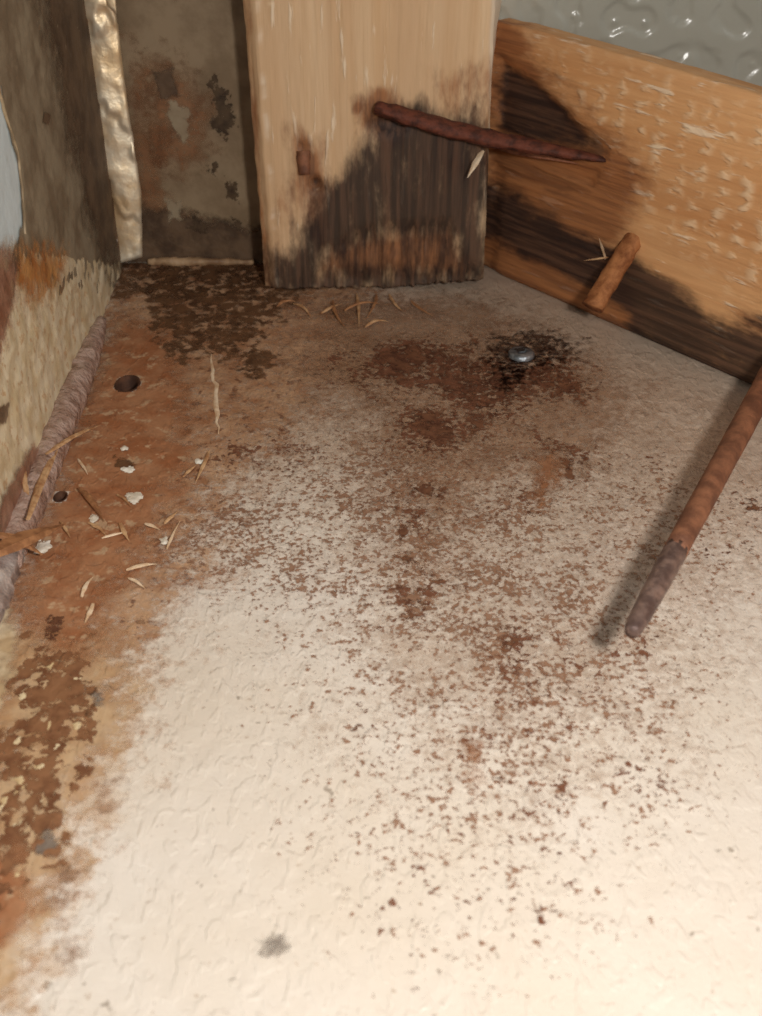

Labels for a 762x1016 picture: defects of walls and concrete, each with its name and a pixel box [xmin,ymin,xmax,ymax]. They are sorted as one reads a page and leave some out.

rust [0,243,67,354]
peeling [33,540,53,554]
peeling [0,251,121,541]
damp [0,0,389,998]
rust [134,295,762,947]
peeling [0,609,97,944]
rust [410,916,496,964]